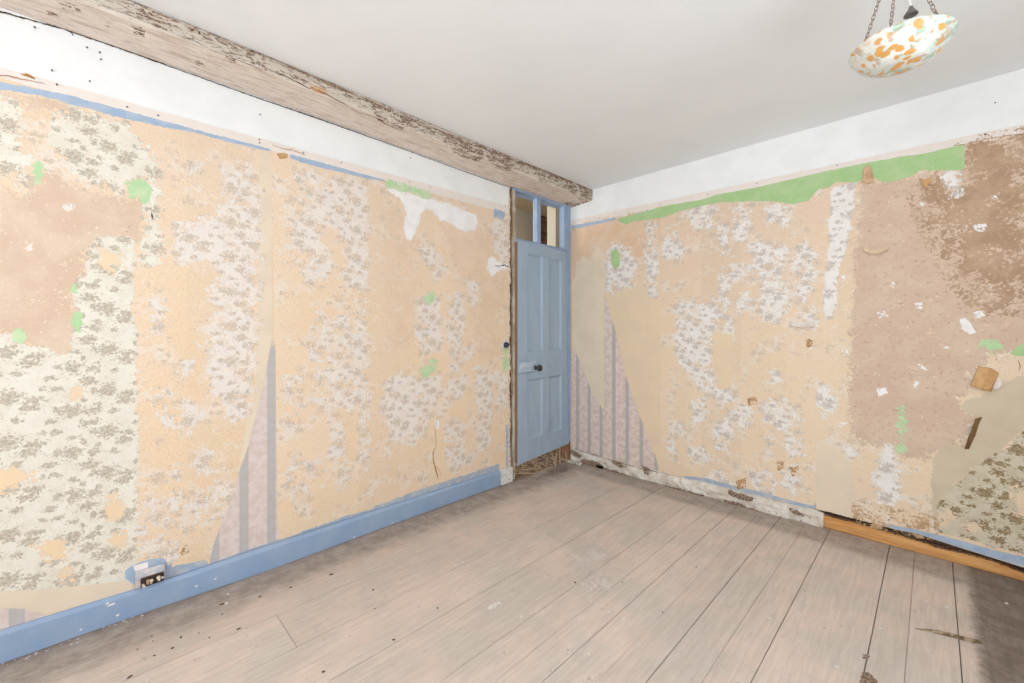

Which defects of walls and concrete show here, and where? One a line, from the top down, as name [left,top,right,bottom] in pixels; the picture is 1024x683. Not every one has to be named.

peeling [225,43,593,207]
peeling [140,180,165,269]
peeling [387,186,511,471]
peeling [643,220,660,299]
peeling [684,203,823,335]
peeling [960,310,1004,391]
peeling [30,538,76,584]
peeling [102,448,236,579]
peeling [281,388,374,508]
flaking render [569,384,825,528]
peeling [936,508,987,534]
peeling [964,417,982,453]